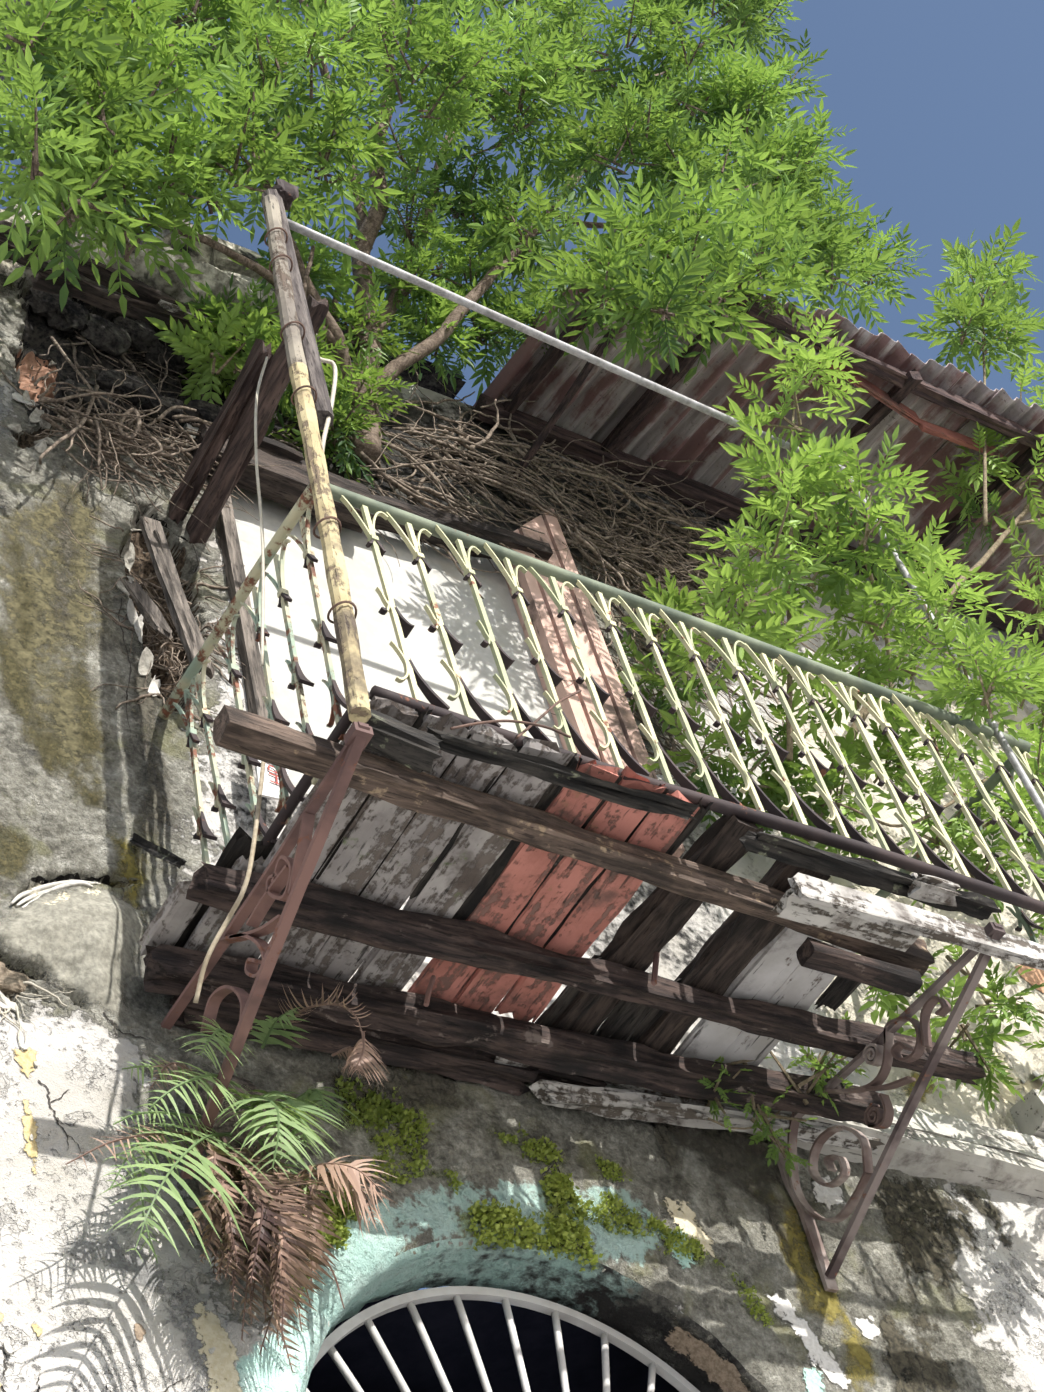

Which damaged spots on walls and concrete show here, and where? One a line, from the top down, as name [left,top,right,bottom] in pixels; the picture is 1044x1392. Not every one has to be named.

damp [0,465,117,805]
spalling [10,880,134,909]
spalling [0,962,30,1012]
peeling [12,1044,39,1078]
crack [38,1080,81,1152]
peeling [812,1176,846,1211]
peeling [662,1195,715,1269]
damp [874,1175,1013,1392]
peeling [192,1302,243,1392]
spalling [664,1318,750,1392]
peeling [765,1293,851,1392]
peeling [854,1316,881,1339]